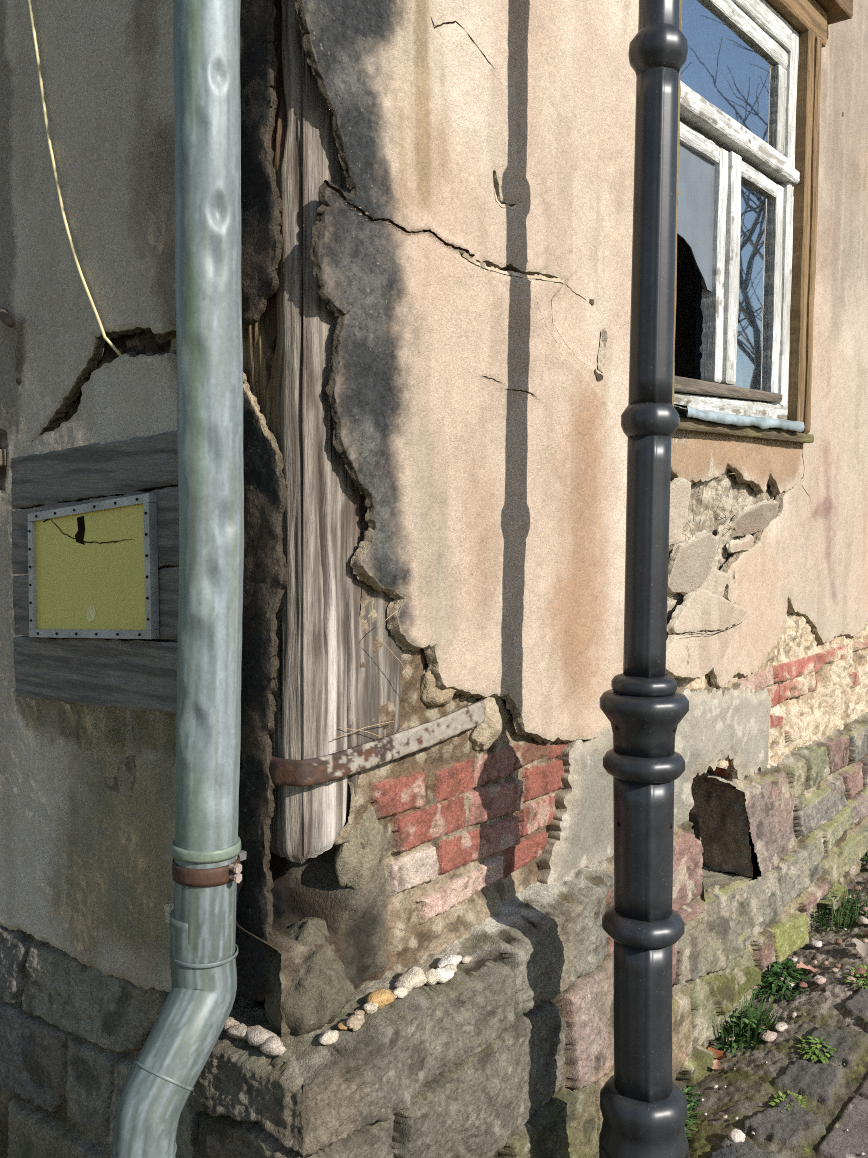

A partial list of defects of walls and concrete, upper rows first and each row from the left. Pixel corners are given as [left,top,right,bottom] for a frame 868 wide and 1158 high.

leakage [240,0,276,323]
leakage [415,0,430,200]
crack [34,327,177,439]
crack [263,338,276,386]
leakage [304,0,410,590]
crack [323,179,586,364]
spalling [236,0,597,1041]
spalling [666,463,868,768]
spalling [716,759,736,771]